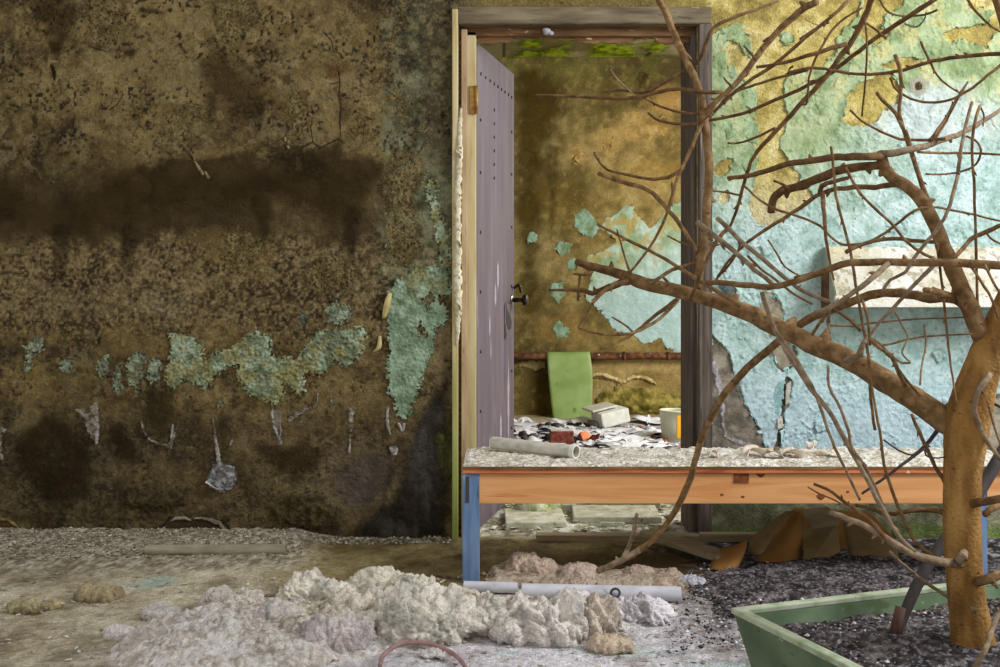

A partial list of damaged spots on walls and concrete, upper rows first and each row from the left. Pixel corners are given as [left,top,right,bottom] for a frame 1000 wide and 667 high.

crack [300,32,346,149]
leakage [0,149,383,231]
peeling [712,0,1000,404]
peeling [21,336,45,374]
leakage [0,402,100,504]
peeling [95,254,369,405]
leakage [259,393,319,471]
leakage [347,408,355,454]
leakage [355,384,446,538]
peeling [550,280,566,303]
peeling [553,201,681,352]
peeling [702,308,943,459]